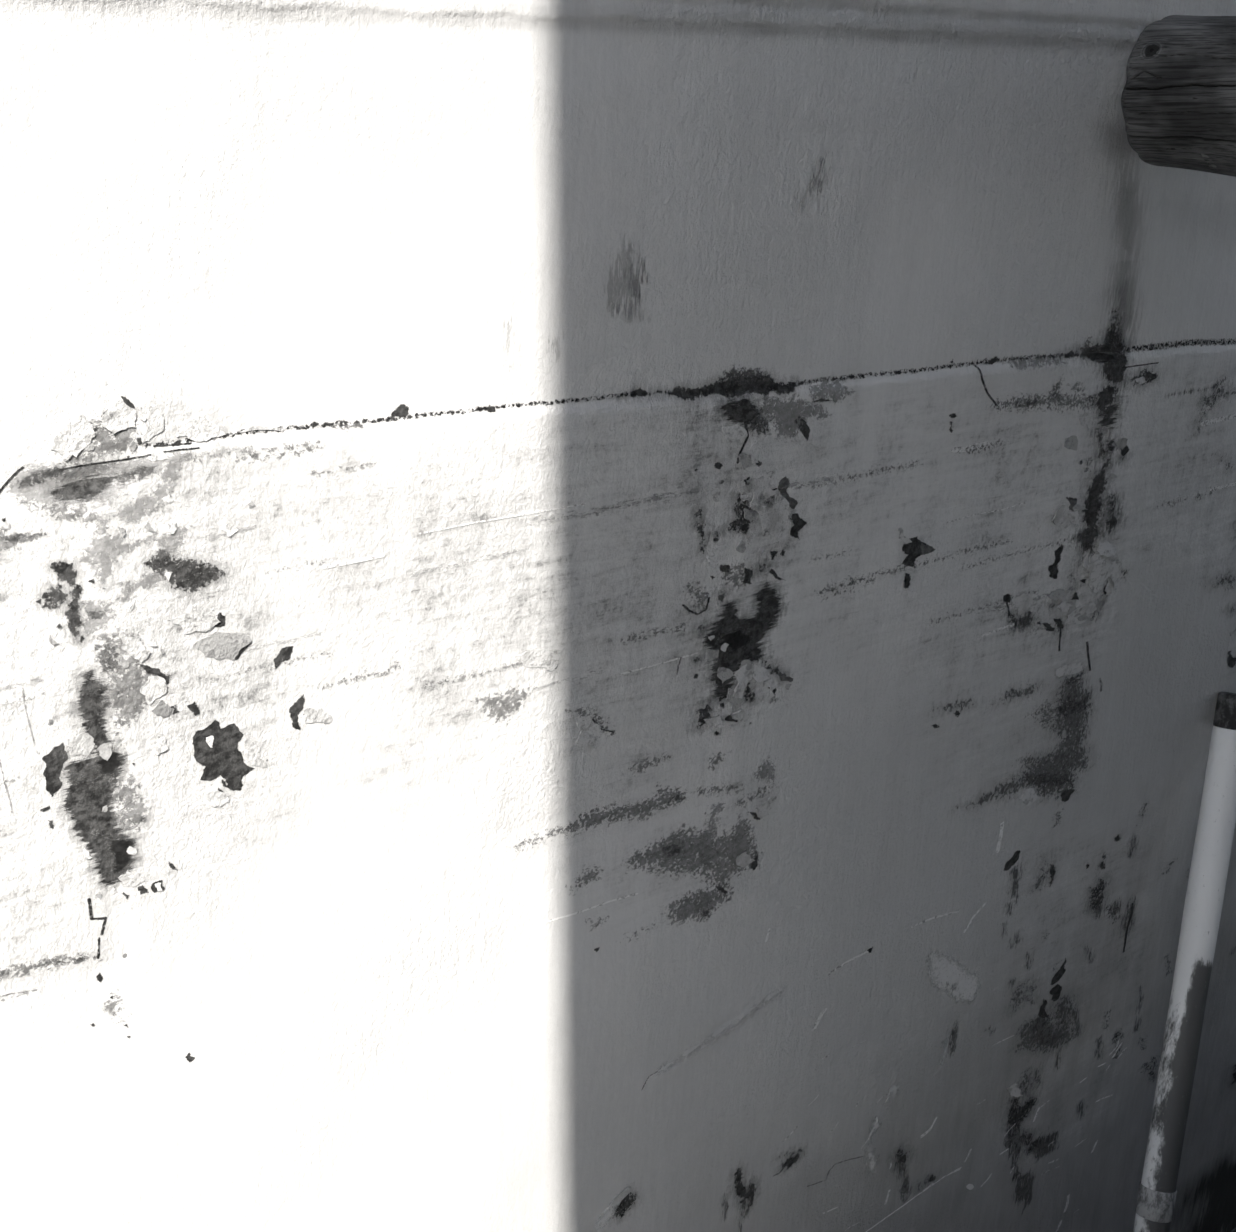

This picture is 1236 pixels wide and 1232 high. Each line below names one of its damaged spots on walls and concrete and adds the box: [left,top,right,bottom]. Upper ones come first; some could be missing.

peeling [50,396,168,465]
peeling [794,415,819,449]
peeling [692,451,807,587]
peeling [898,528,935,589]
peeling [168,612,251,660]
leakage [995,674,1091,730]
peeling [40,743,68,829]
peeling [192,720,267,807]
leakage [957,755,1074,809]
peeling [118,872,165,899]
leakage [668,884,734,926]